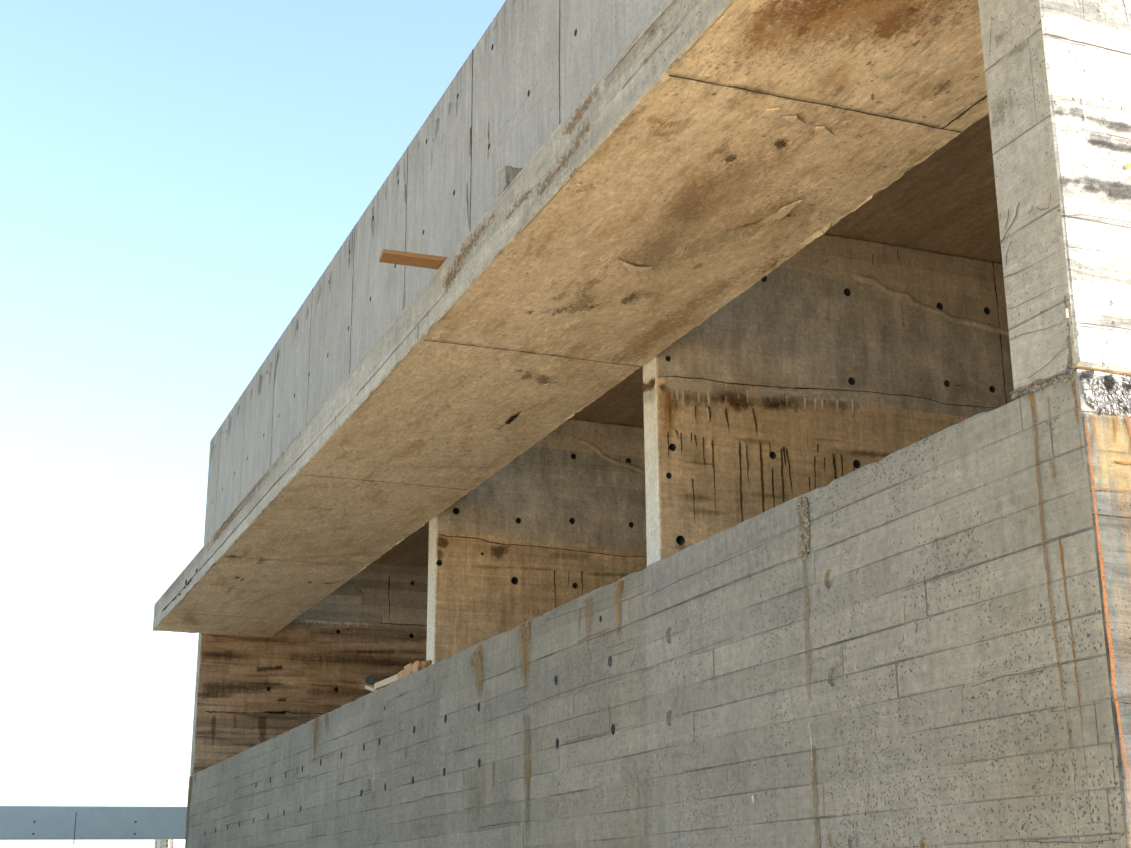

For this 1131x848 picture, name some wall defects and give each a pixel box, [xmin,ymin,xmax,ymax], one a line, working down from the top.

water stain [666,381,879,522]
corrosion [1035,444,1082,747]